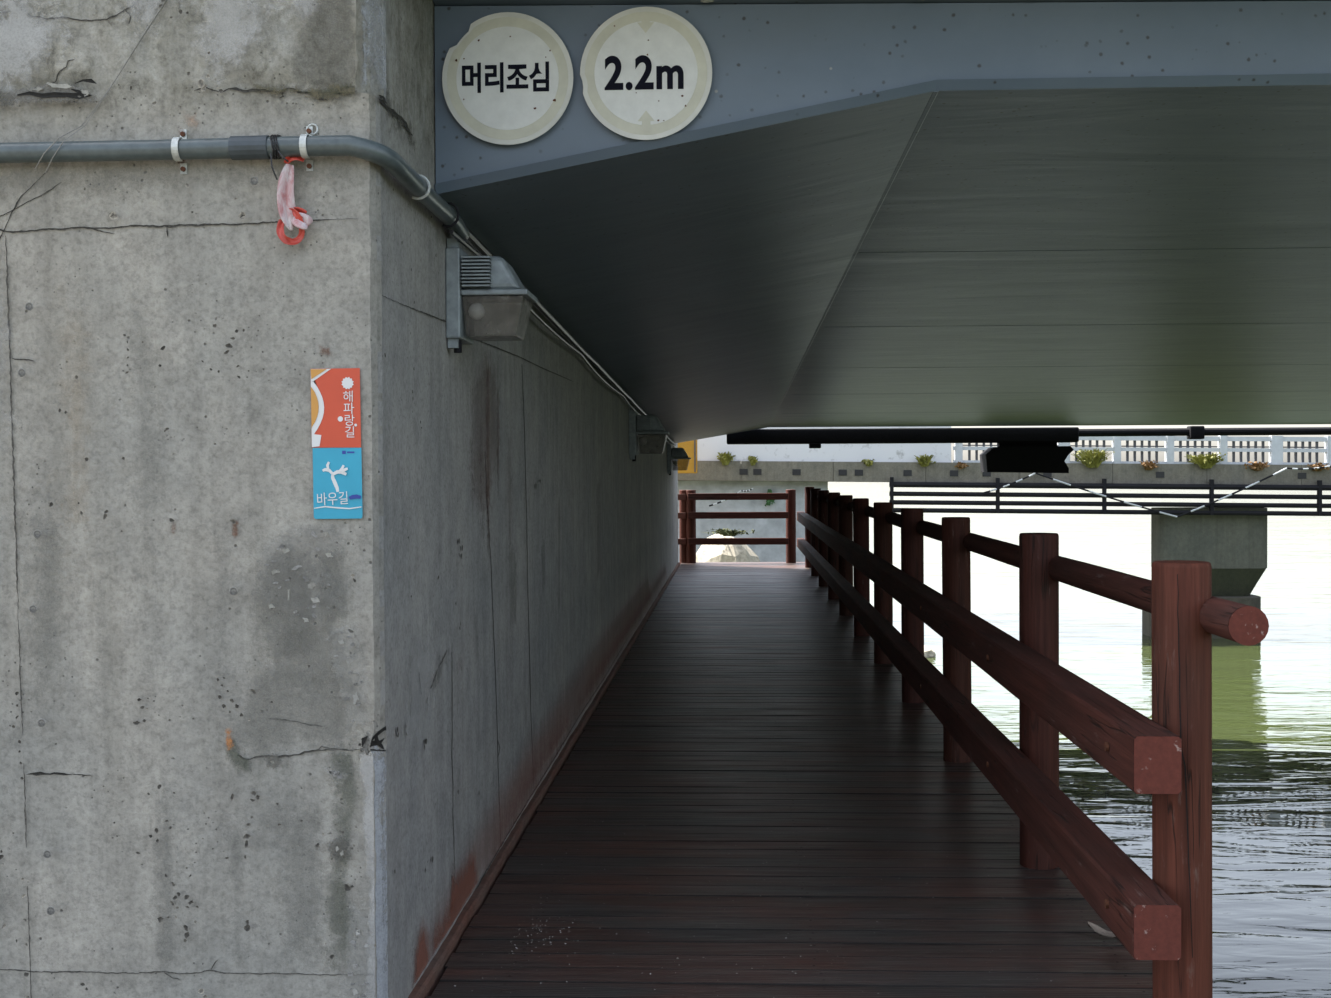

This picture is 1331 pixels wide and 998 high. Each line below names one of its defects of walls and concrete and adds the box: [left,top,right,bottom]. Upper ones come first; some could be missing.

crack [0,0,138,23]
spalling [0,79,97,107]
crack [0,173,278,847]
crack [238,718,360,760]